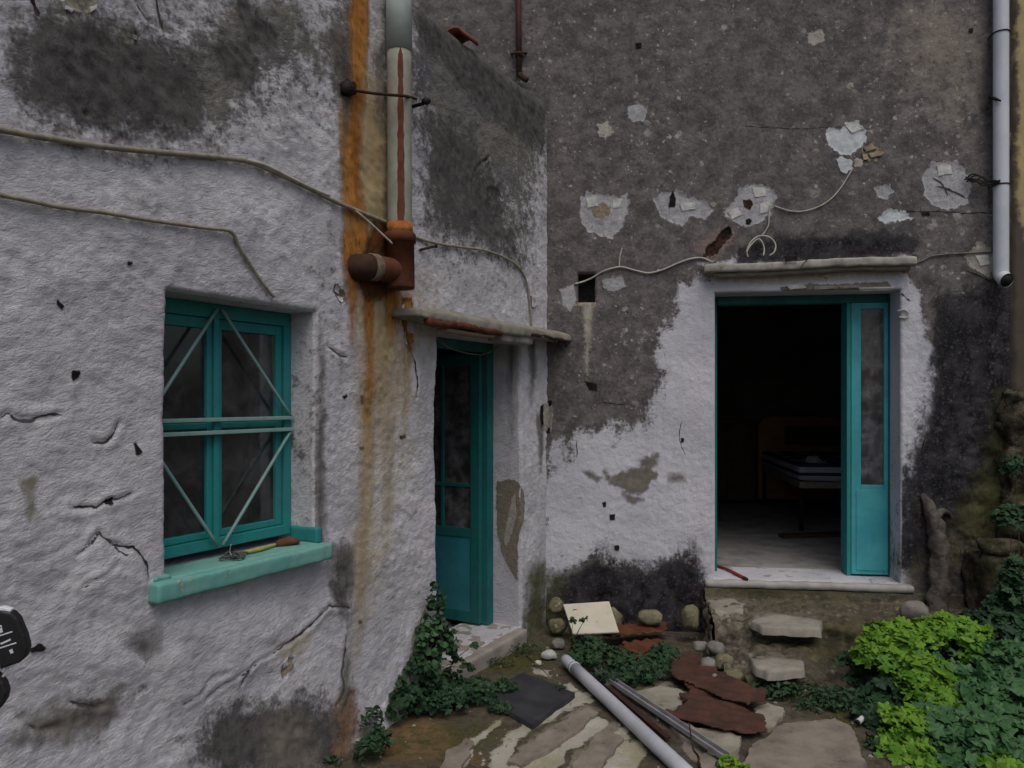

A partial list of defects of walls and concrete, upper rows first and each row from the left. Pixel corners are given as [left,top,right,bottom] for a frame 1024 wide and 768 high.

water stain [6,4,212,165]
spalling [579,191,630,240]
spalling [653,183,778,260]
spalling [825,120,884,174]
spalling [922,160,972,211]
rust [333,0,413,531]
crack [2,413,62,423]
water stain [901,272,1012,569]
crack [73,492,149,579]
mould [557,546,706,633]
crack [217,605,349,689]
water stain [199,661,349,768]